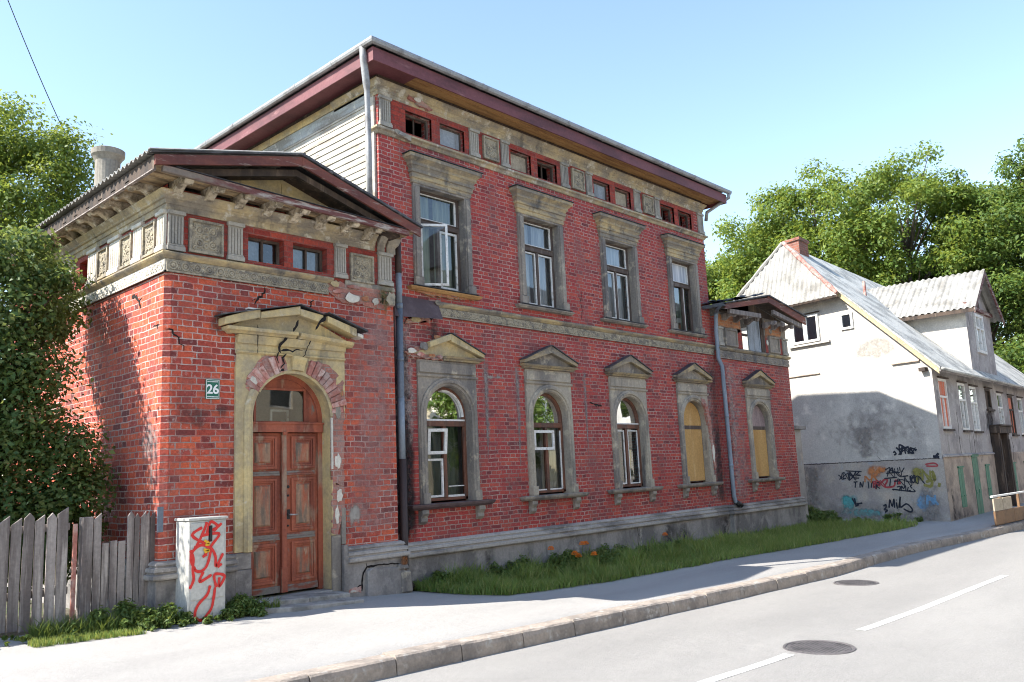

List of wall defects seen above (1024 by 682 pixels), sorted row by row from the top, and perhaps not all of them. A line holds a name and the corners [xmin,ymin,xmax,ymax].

crack [132,294,184,349]
crack [254,287,366,357]
spalling [328,280,395,310]
spalling [306,360,347,535]
crack [358,563,400,590]